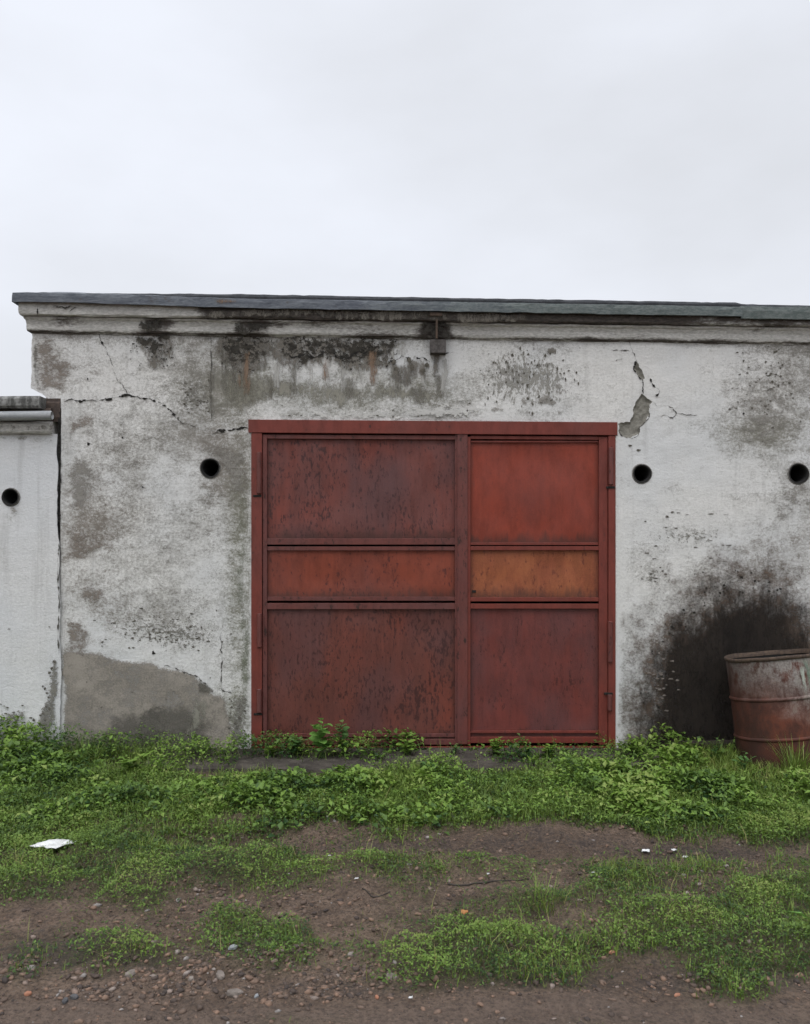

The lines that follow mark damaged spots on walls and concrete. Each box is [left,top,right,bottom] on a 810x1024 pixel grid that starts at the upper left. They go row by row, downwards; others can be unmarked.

leakage [130,319,175,369]
leakage [200,308,525,415]
flaking render [618,394,652,451]
flaking render [633,361,645,379]
crack [618,378,696,418]
crack [57,334,247,660]
peeling [641,511,731,584]
leakage [61,622,237,752]